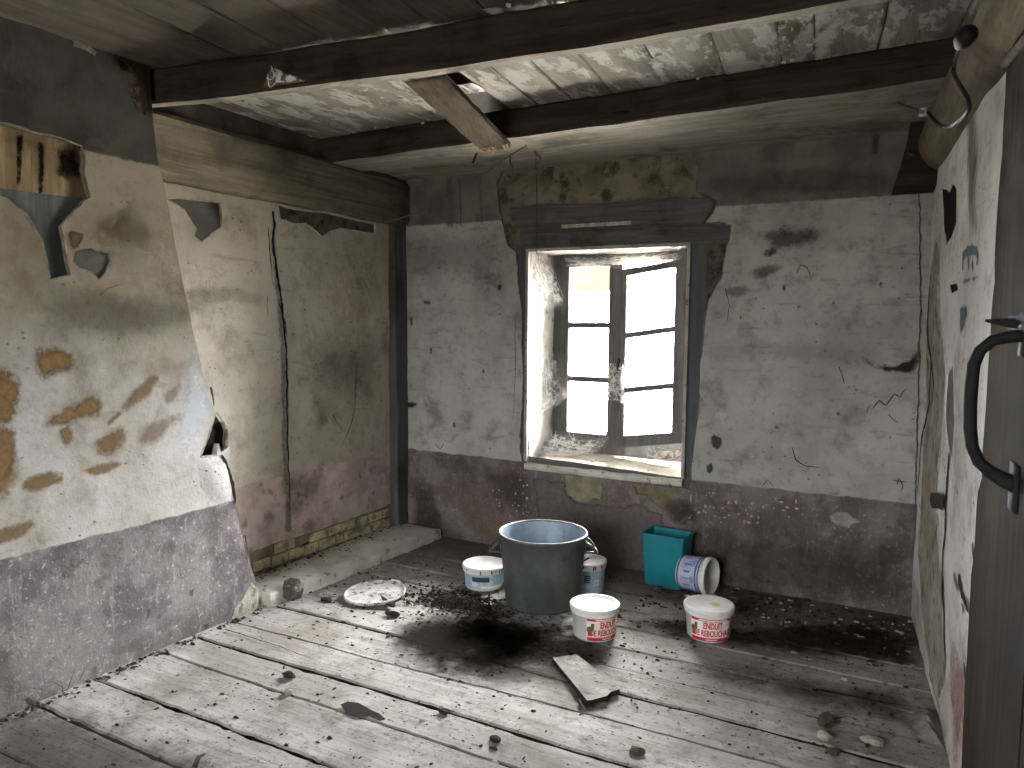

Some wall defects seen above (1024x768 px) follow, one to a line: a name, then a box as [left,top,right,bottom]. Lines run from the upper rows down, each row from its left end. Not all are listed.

peeling [648,53,670,82]
spalling [0,122,112,280]
flaking render [167,196,222,242]
spalling [279,205,376,239]
damp [757,231,815,277]
spalling [496,153,799,524]
crack [245,211,310,573]
crack [867,194,934,558]
spalling [200,412,229,458]
flaking render [917,184,958,714]
peeling [830,512,865,529]